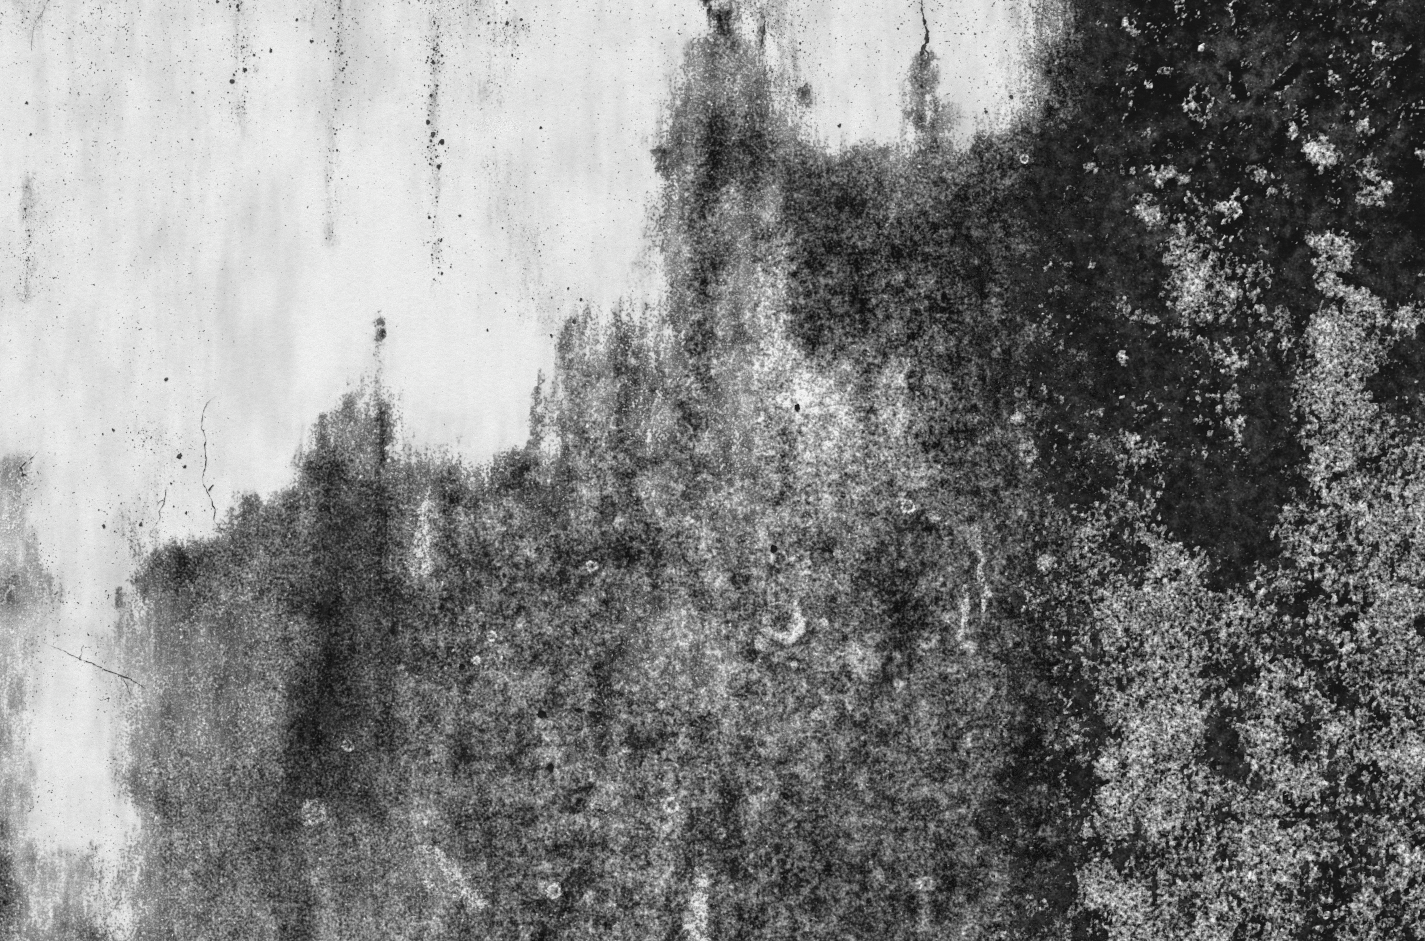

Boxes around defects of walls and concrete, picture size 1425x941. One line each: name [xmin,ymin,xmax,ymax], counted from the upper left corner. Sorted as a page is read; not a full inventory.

crack [919,0,929,59]
water stain [208,0,272,125]
water stain [306,0,355,244]
water stain [415,0,571,284]
water stain [373,311,386,355]
crack [201,402,238,544]
water stain [1365,535,1425,590]
water stain [772,612,790,630]
crack [50,645,144,694]
water stain [1116,670,1149,695]
water stain [1398,695,1422,734]
water stain [1210,890,1273,941]